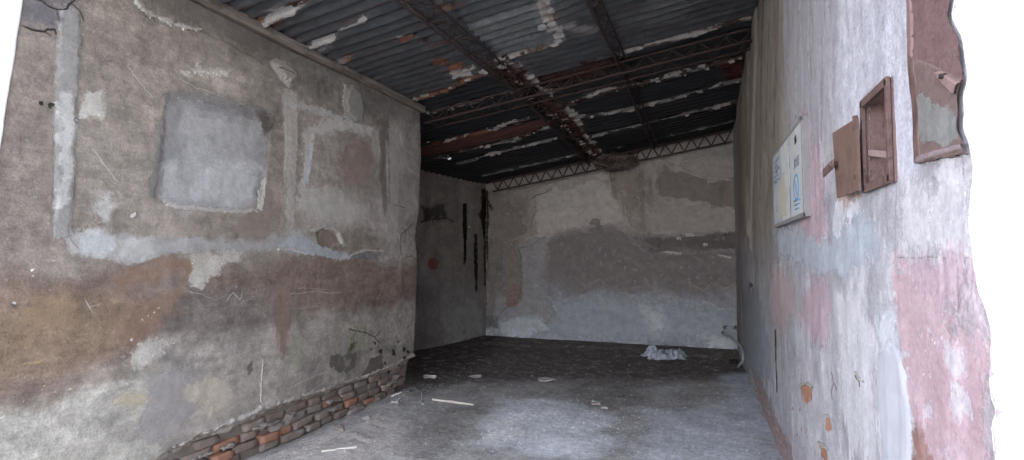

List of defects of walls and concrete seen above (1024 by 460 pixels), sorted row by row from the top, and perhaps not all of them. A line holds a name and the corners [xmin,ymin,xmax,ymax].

peeling [308,15,367,51]
peeling [537,0,602,39]
rust [433,15,752,160]
peeling [559,54,746,121]
peeling [584,99,738,141]
water stain [443,0,830,378]
peeling [833,192,859,239]
spalling [310,225,386,260]
peeling [639,231,736,259]
peeling [891,247,991,460]
spalling [157,340,415,460]
spalling [792,381,813,412]